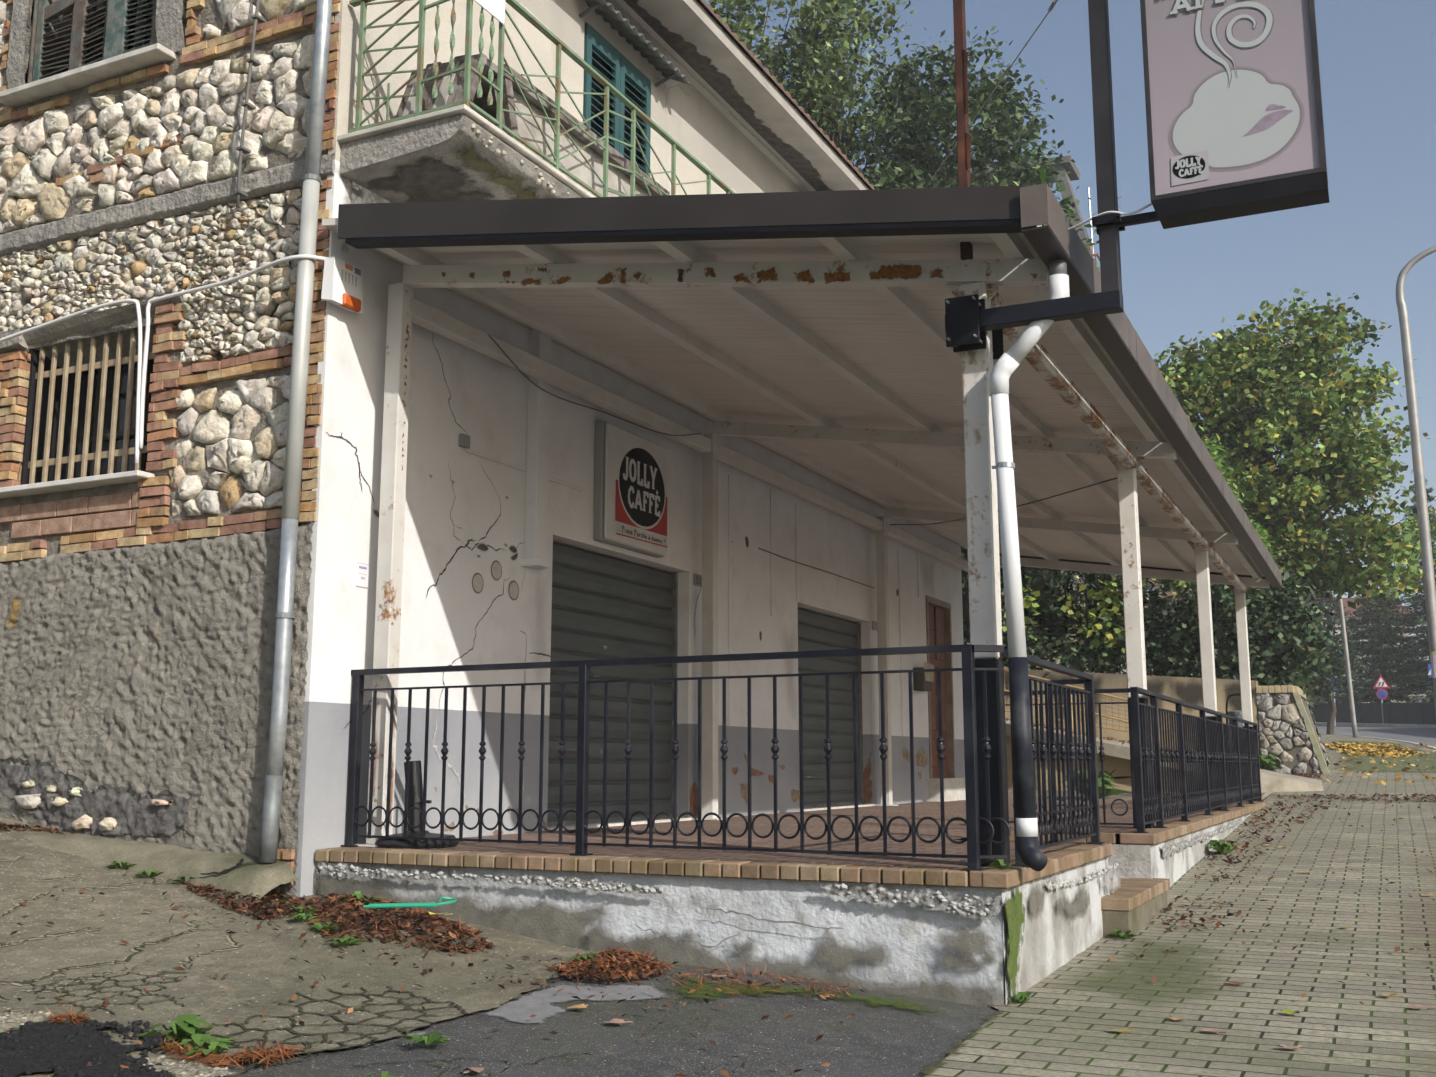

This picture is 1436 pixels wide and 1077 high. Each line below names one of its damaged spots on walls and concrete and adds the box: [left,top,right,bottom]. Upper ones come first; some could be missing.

rust [500,267,571,286]
rust [598,268,642,284]
rust [734,267,850,284]
rust [869,264,943,280]
crack [325,432,375,507]
crack [426,335,525,811]
crack [520,631,550,691]
peeling [0,757,191,836]
flaking render [816,883,1003,919]
crack [0,856,573,1077]